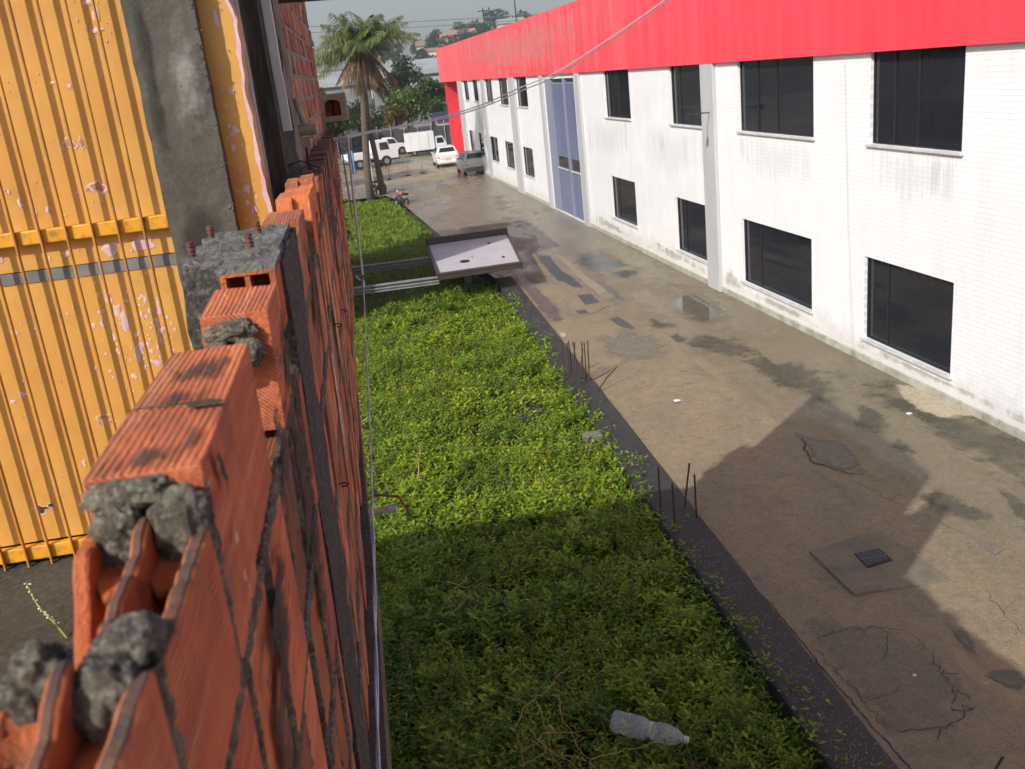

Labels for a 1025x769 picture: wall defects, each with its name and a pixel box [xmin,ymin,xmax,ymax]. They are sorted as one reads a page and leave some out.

peeling [65,0,126,43]
peeling [201,0,273,248]
peeling [52,135,94,158]
peeling [71,178,114,202]
peeling [33,235,156,260]
peeling [85,269,182,393]
crack [735,559,975,769]